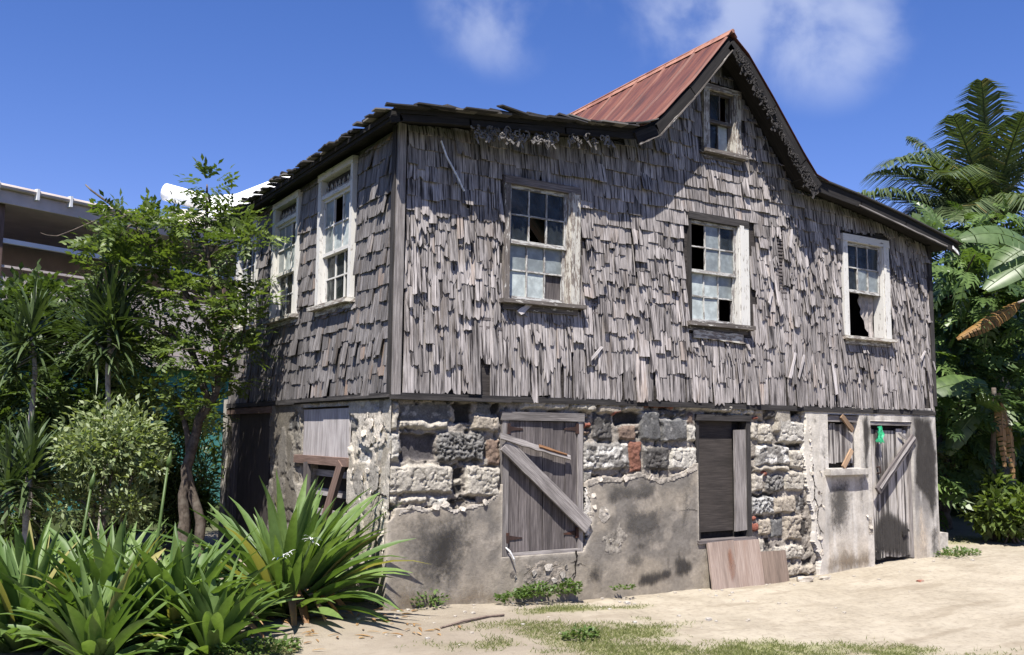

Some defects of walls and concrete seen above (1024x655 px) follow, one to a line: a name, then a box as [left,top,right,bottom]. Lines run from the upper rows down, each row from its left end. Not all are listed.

flaking render [357,410,386,447]
flaking render [351,465,380,496]
water stain [611,484,653,502]
spalling [809,424,826,559]
water stain [419,521,469,579]
water stain [627,511,657,564]
water stain [639,559,691,585]